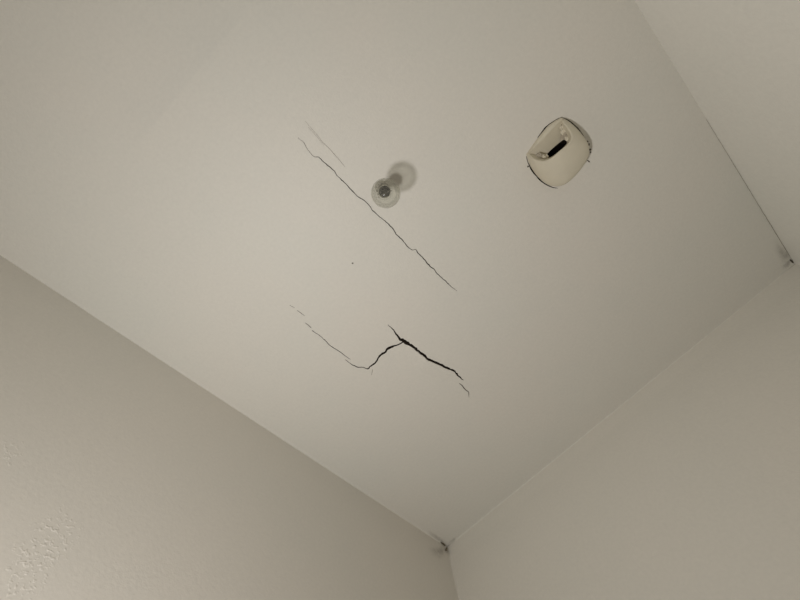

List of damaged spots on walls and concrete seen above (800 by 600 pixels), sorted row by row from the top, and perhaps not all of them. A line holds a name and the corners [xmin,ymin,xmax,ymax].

crack [304,121,457,291]
crack [290,305,469,394]